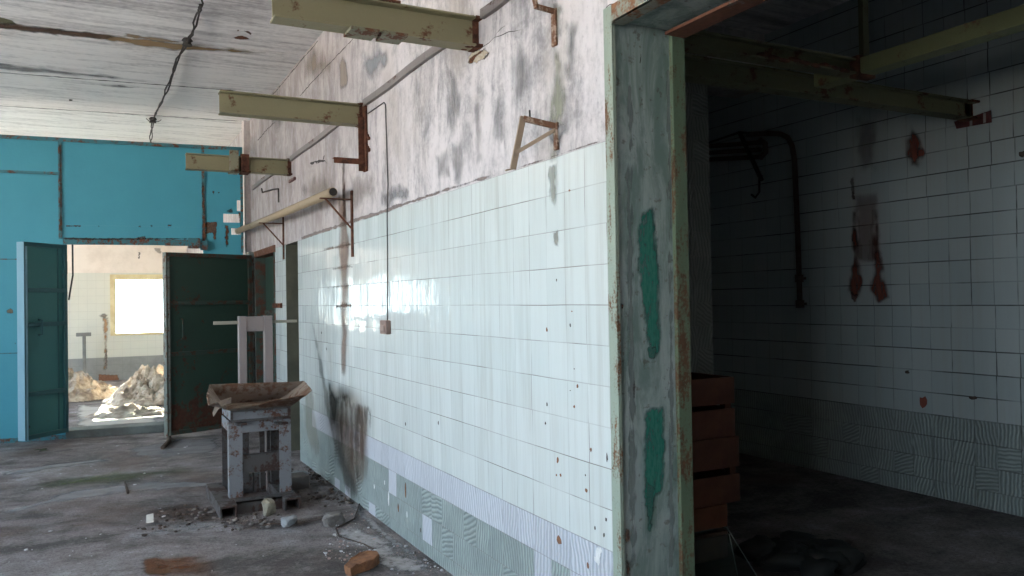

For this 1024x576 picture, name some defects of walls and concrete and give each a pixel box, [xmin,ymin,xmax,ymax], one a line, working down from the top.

water stain [0,17,248,52]
water stain [308,52,347,88]
water stain [366,54,386,74]
water stain [449,78,459,124]
water stain [548,29,574,203]
rust [907,131,925,164]
rust [59,145,186,240]
rust [202,182,241,246]
water stain [384,188,407,205]
rust [849,213,888,302]
peeling [626,168,675,567]